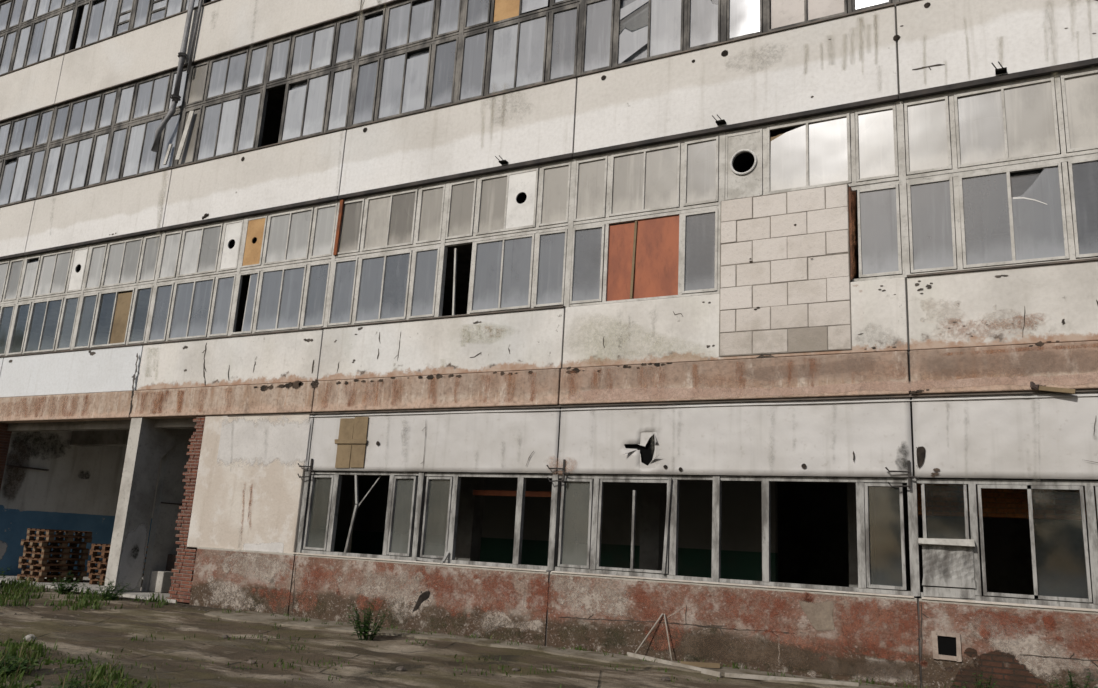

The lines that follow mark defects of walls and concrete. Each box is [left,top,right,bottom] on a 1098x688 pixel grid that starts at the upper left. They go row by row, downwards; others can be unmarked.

spalling [254,379,319,391]
spalling [916,446,940,477]
spalling [207,542,292,612]
spalling [355,570,465,632]
peeling [468,573,927,683]
spalling [945,610,1098,688]